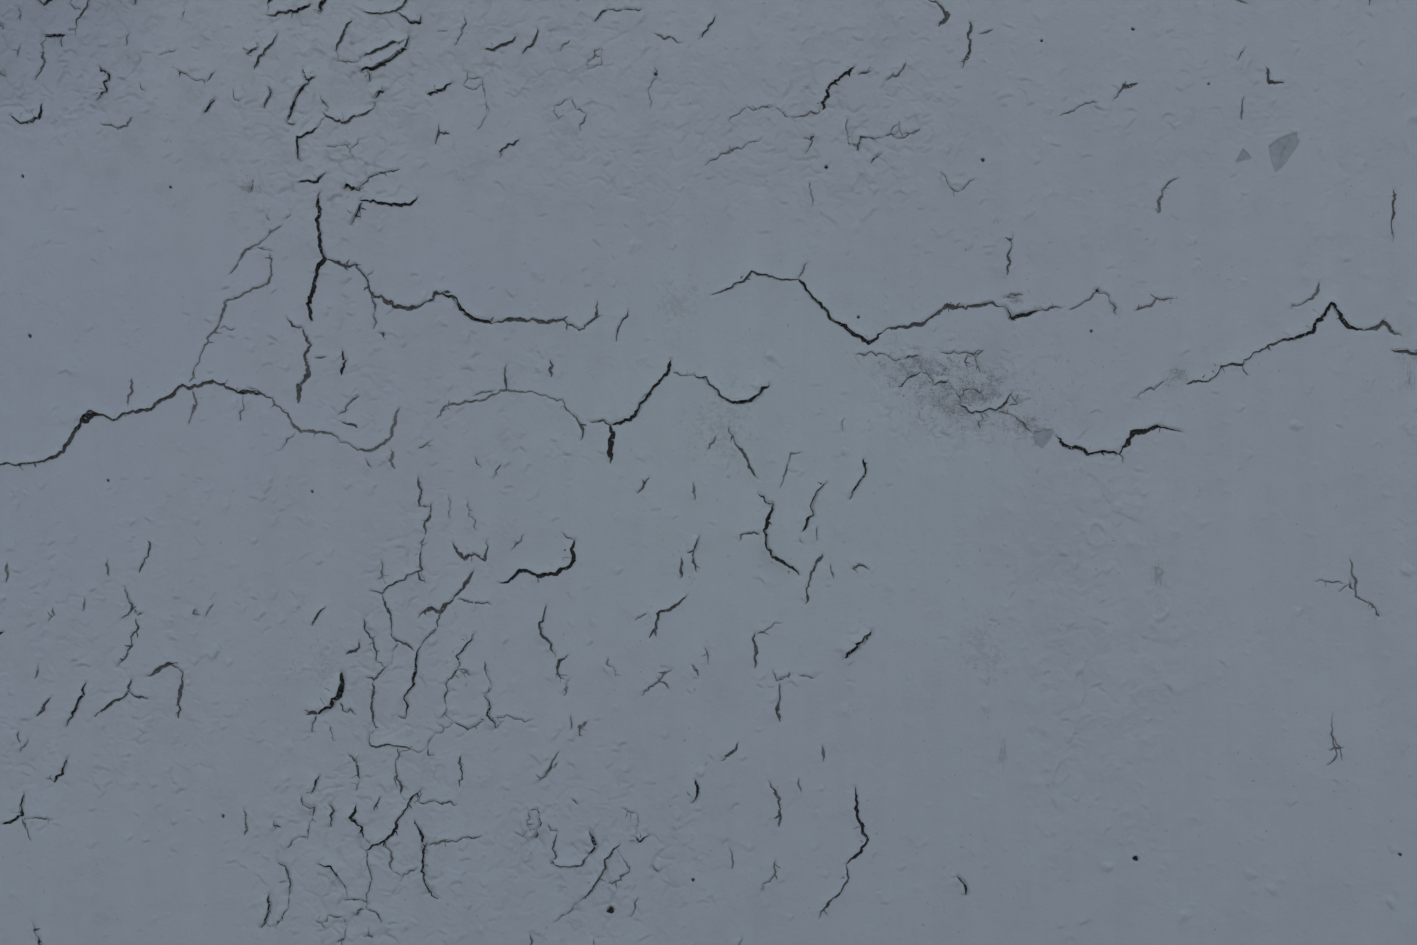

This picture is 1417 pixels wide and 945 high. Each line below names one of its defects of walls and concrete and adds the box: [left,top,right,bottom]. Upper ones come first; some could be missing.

crack [1154,178,1177,213]
crack [1390,190,1398,242]
crack [711,237,1173,345]
crack [1057,284,1417,462]
crack [0,191,871,721]
crack [1317,560,1379,616]
crack [418,497,588,779]
crack [306,642,360,741]
crack [307,774,319,794]
crack [687,743,738,803]
crack [768,746,825,826]
crack [817,787,869,919]